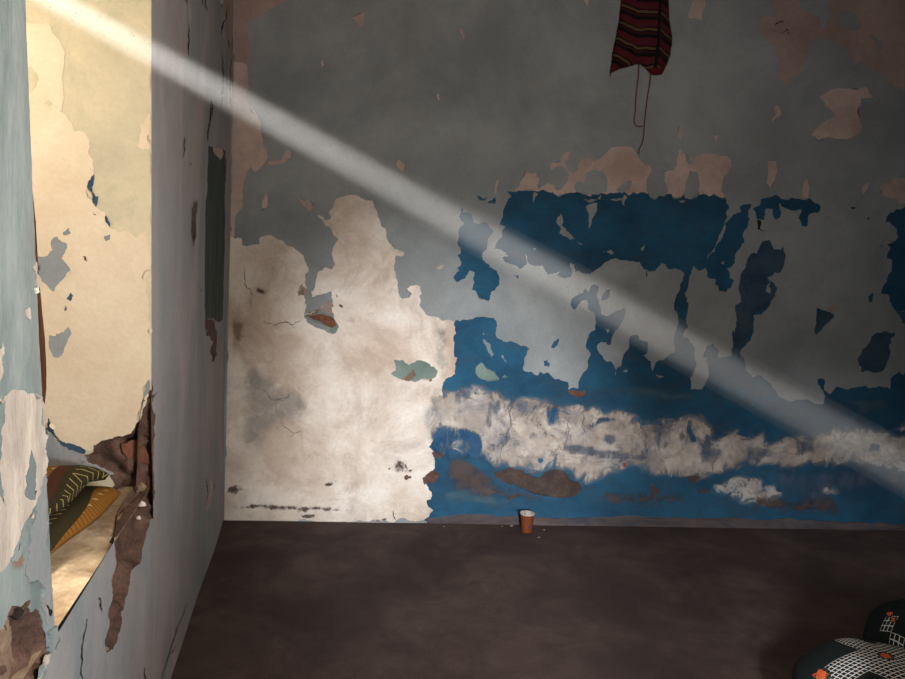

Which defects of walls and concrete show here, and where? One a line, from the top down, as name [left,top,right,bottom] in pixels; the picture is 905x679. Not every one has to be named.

peeling [0,23,156,679]
crack [186,0,232,139]
peeling [205,0,905,525]